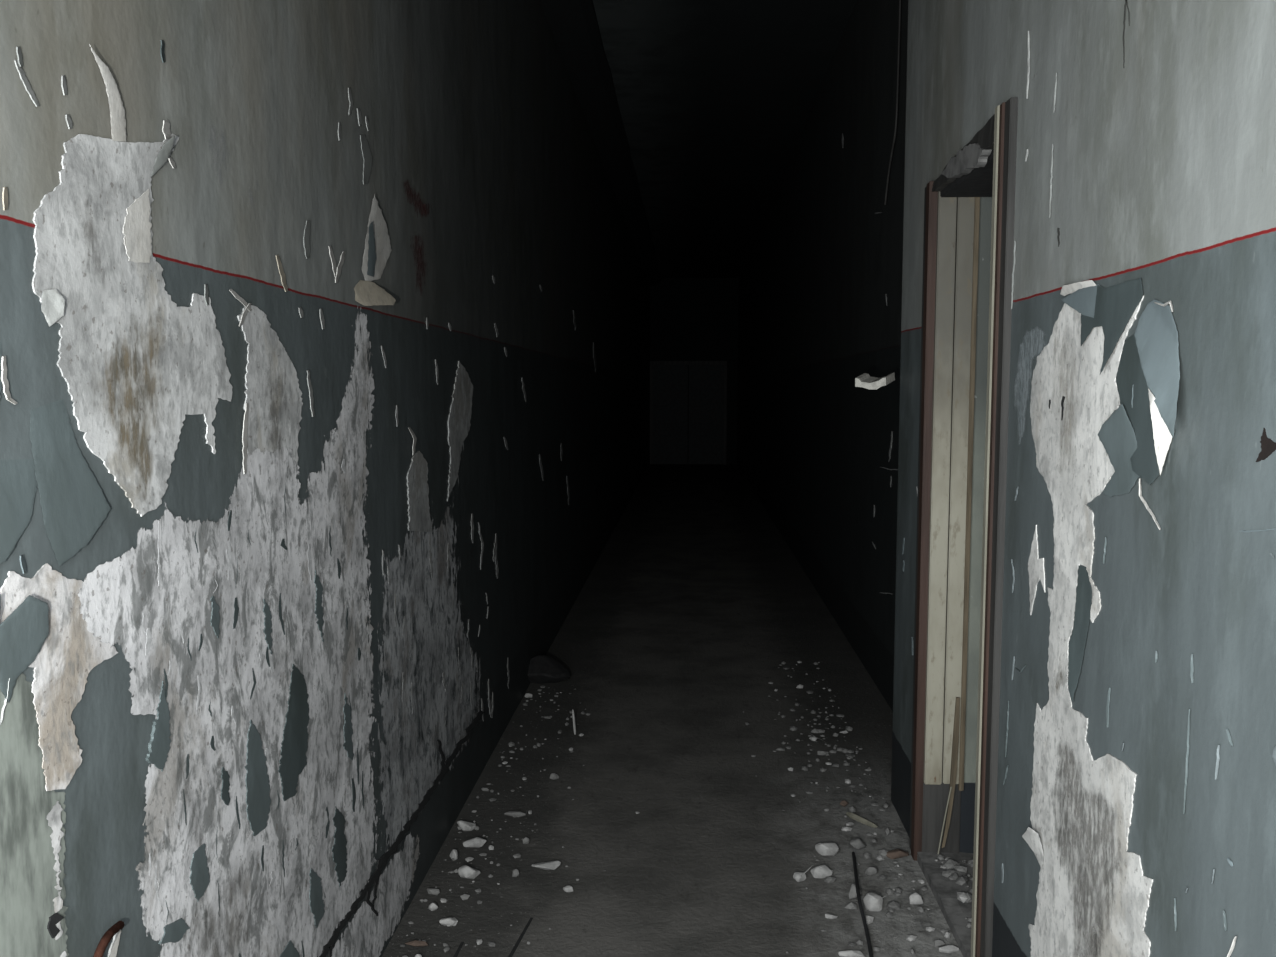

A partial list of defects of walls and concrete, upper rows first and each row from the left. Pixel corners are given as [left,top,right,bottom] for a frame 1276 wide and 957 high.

crack [1122,0,1130,68]
peeling [0,44,494,957]
peeling [1011,278,1180,957]